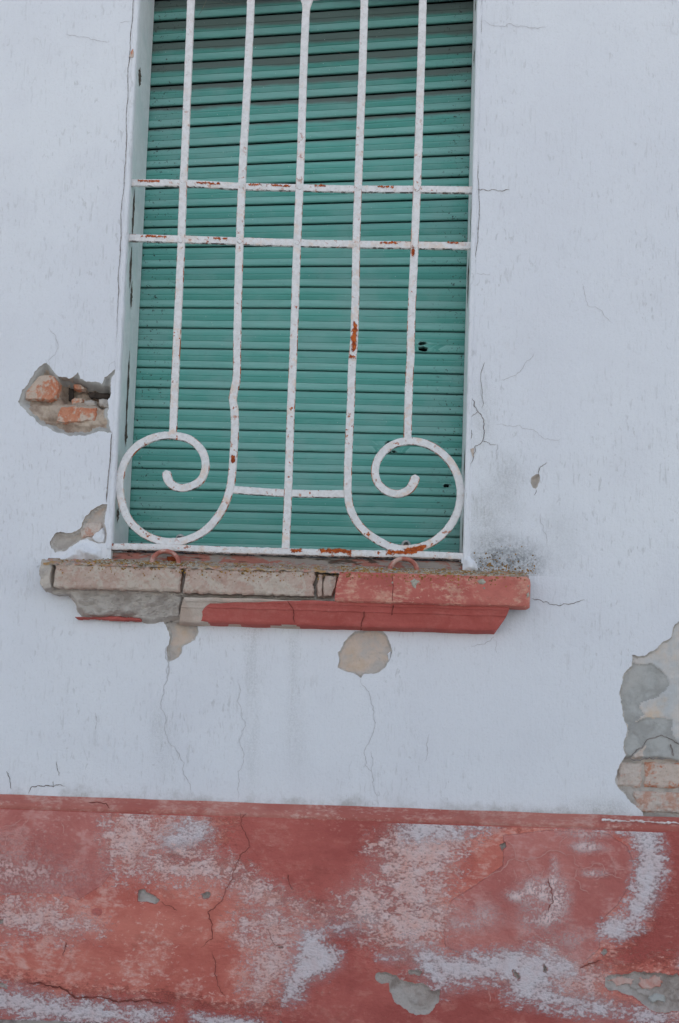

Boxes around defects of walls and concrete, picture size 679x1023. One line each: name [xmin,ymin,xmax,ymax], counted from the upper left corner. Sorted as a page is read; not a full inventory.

crack [67,0,134,337]
rust [349,322,358,359]
spalling [19,363,115,436]
spalling [51,505,120,552]
crack [160,646,192,794]
crack [205,684,250,995]
peeling [95,621,679,1023]
peeling [0,891,112,948]
peeling [0,980,175,1023]